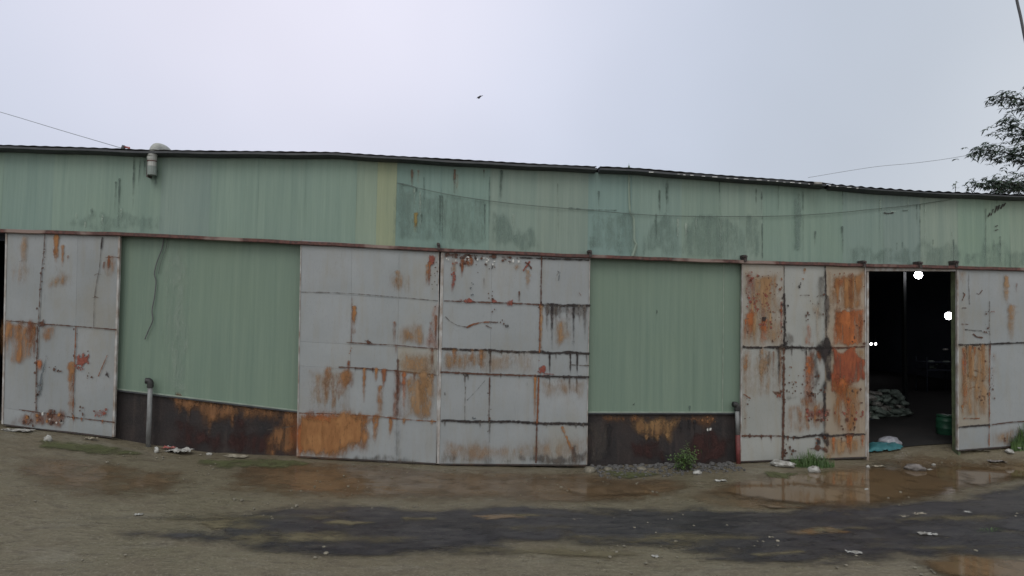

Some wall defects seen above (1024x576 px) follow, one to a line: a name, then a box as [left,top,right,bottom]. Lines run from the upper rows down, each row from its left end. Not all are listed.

rust [5,234,117,423]
rust [174,256,591,465]
rust [610,416,712,439]
rust [742,266,866,460]
rust [958,301,1024,446]